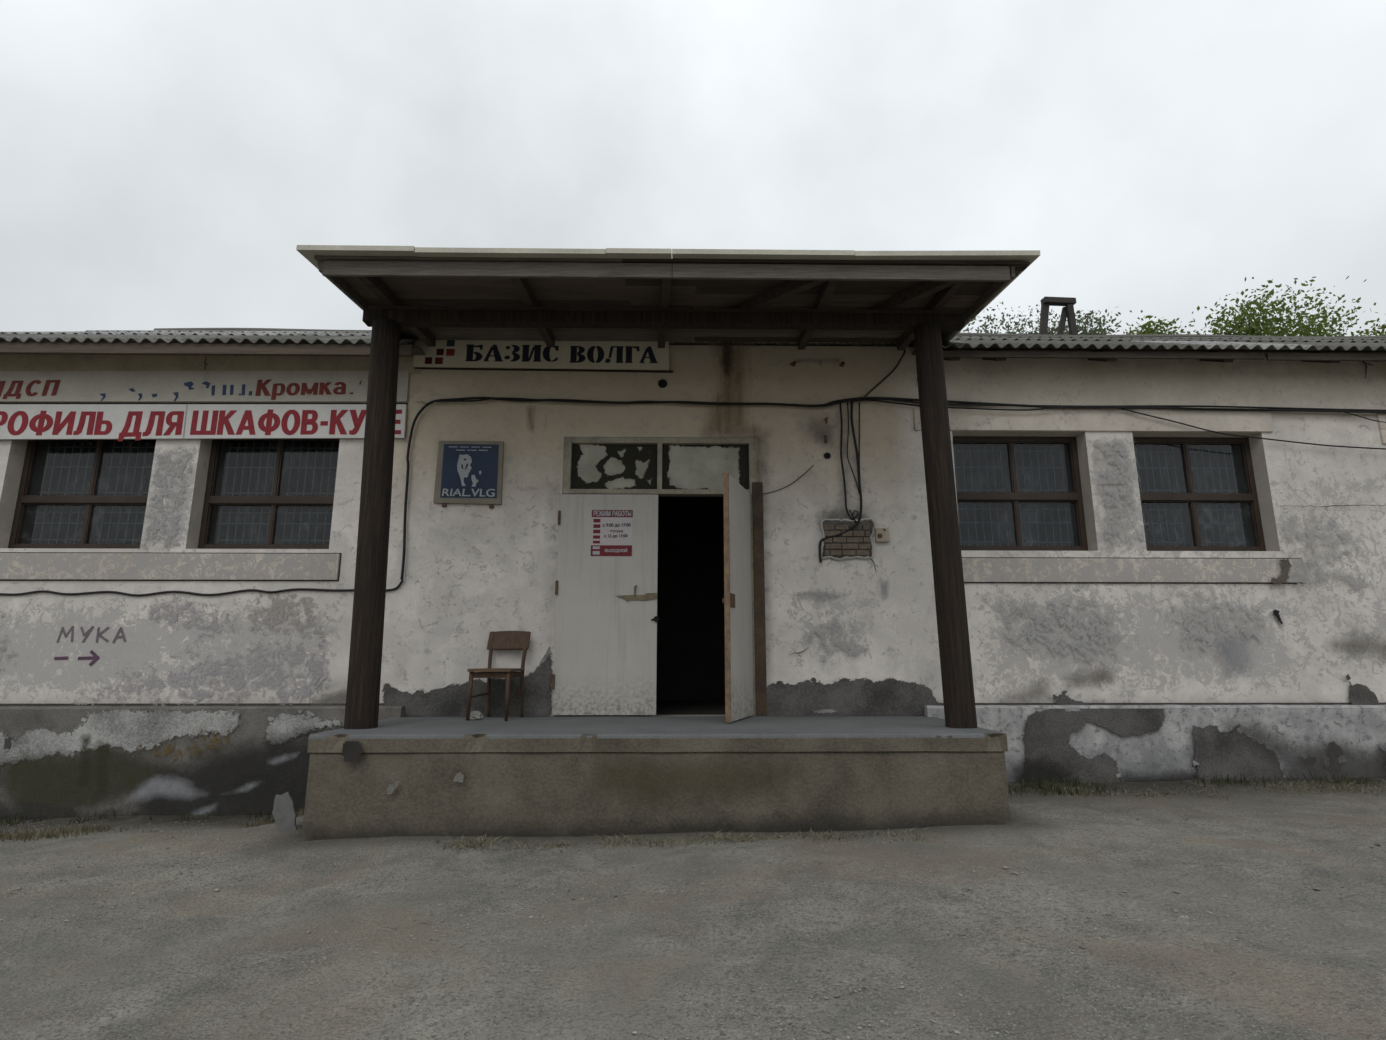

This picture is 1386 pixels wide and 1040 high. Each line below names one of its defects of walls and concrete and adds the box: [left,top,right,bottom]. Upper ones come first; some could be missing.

peeling [0,591,363,766]
spalling [382,647,553,716]
spalling [767,612,943,716]
spalling [1021,691,1170,783]
spalling [1192,724,1285,780]